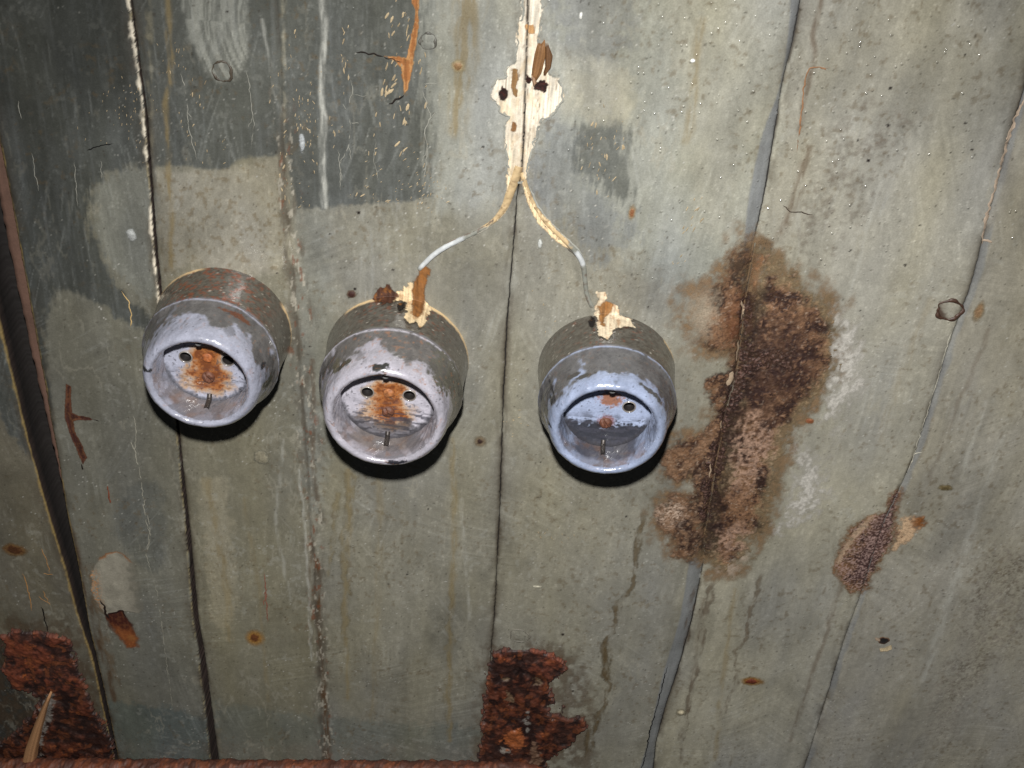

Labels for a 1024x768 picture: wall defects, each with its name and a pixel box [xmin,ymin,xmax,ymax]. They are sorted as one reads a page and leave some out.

peeling [491,0,564,184]
peeling [90,552,142,648]
crack [641,667,668,768]